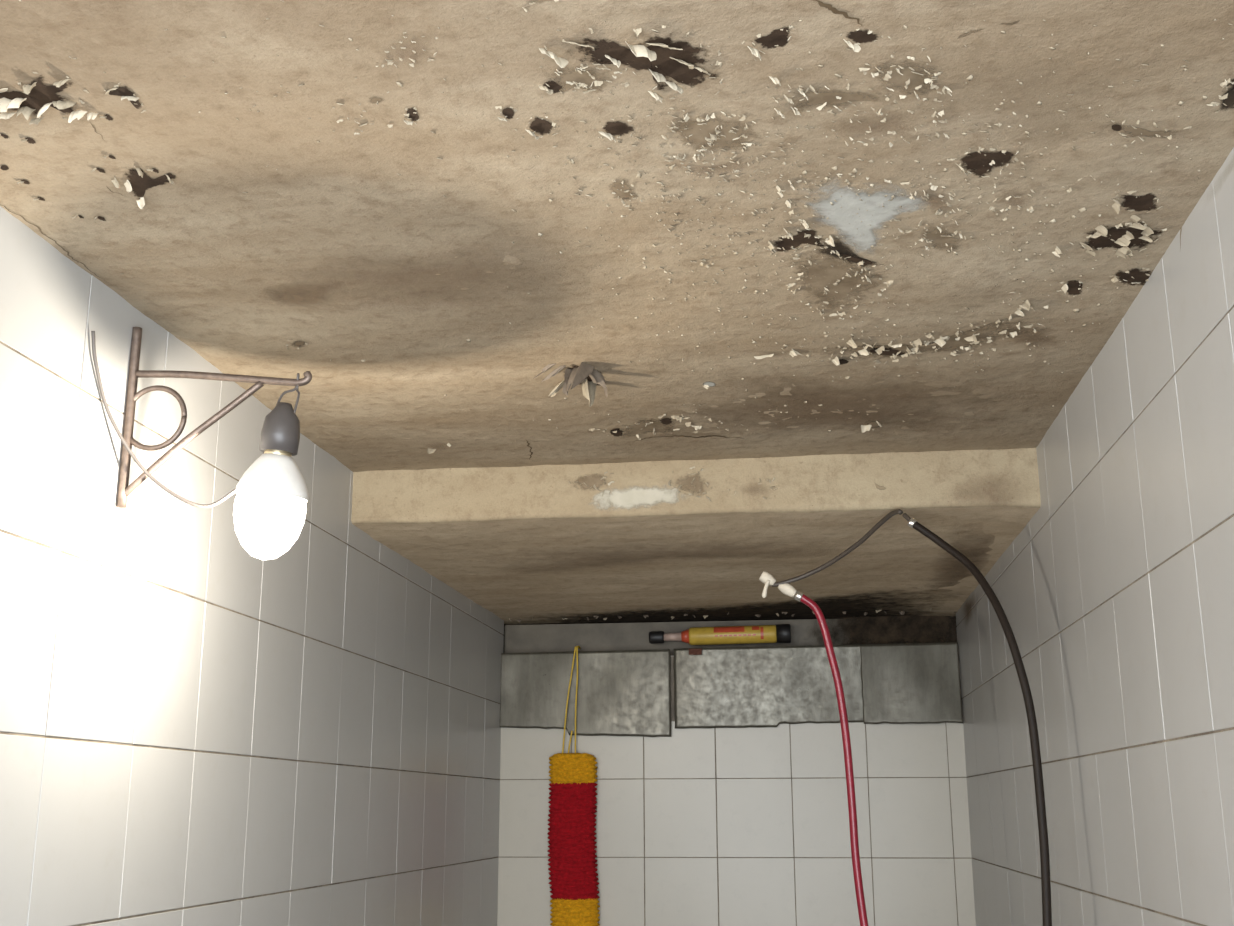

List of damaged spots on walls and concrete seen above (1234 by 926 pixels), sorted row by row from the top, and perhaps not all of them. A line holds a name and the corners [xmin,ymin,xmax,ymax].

crack [813,0,862,26]
peeling [538,25,723,103]
flaking render [1206,78,1234,113]
peeling [0,72,176,209]
peeling [598,118,638,142]
peeling [661,113,759,181]
peeling [767,173,975,318]
peeling [1052,189,1167,285]
peeling [1057,280,1083,297]
peeling [823,300,1048,366]
peeling [533,362,607,407]
peeling [589,414,712,440]